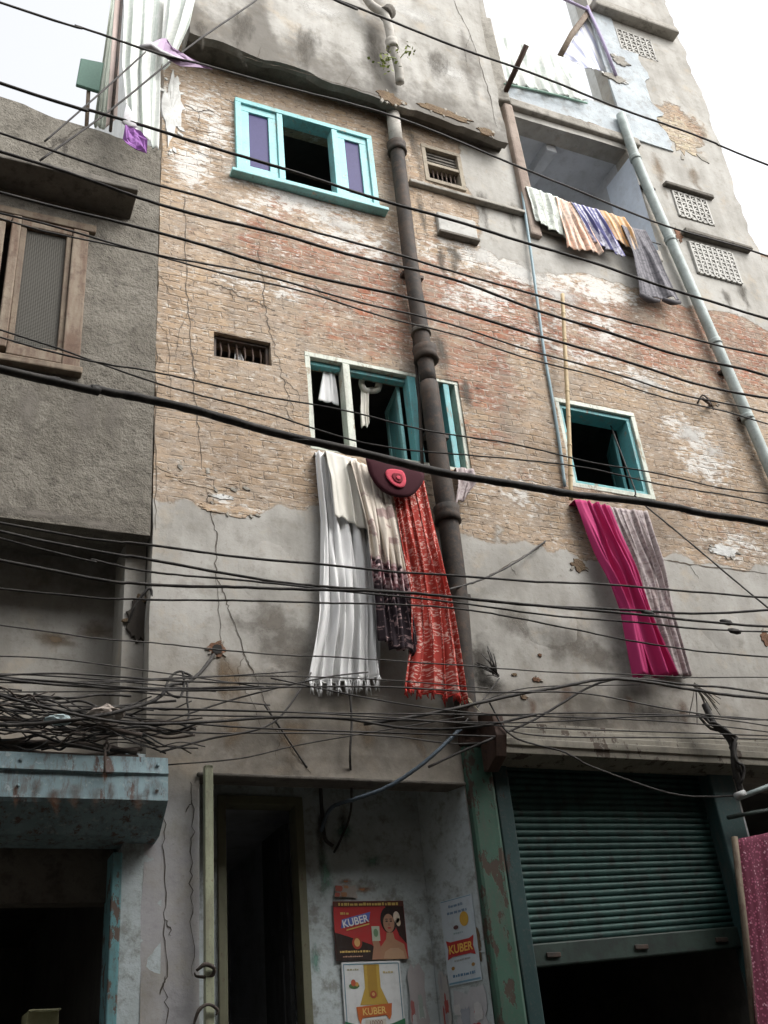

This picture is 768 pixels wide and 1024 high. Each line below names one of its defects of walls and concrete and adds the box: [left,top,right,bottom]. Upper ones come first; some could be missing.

spalling [375,89,495,140]
spalling [654,105,709,164]
spalling [156,464,261,519]
crack [154,203,311,773]
spalling [570,558,589,573]
spalling [708,544,741,560]
crack [160,782,195,1023]